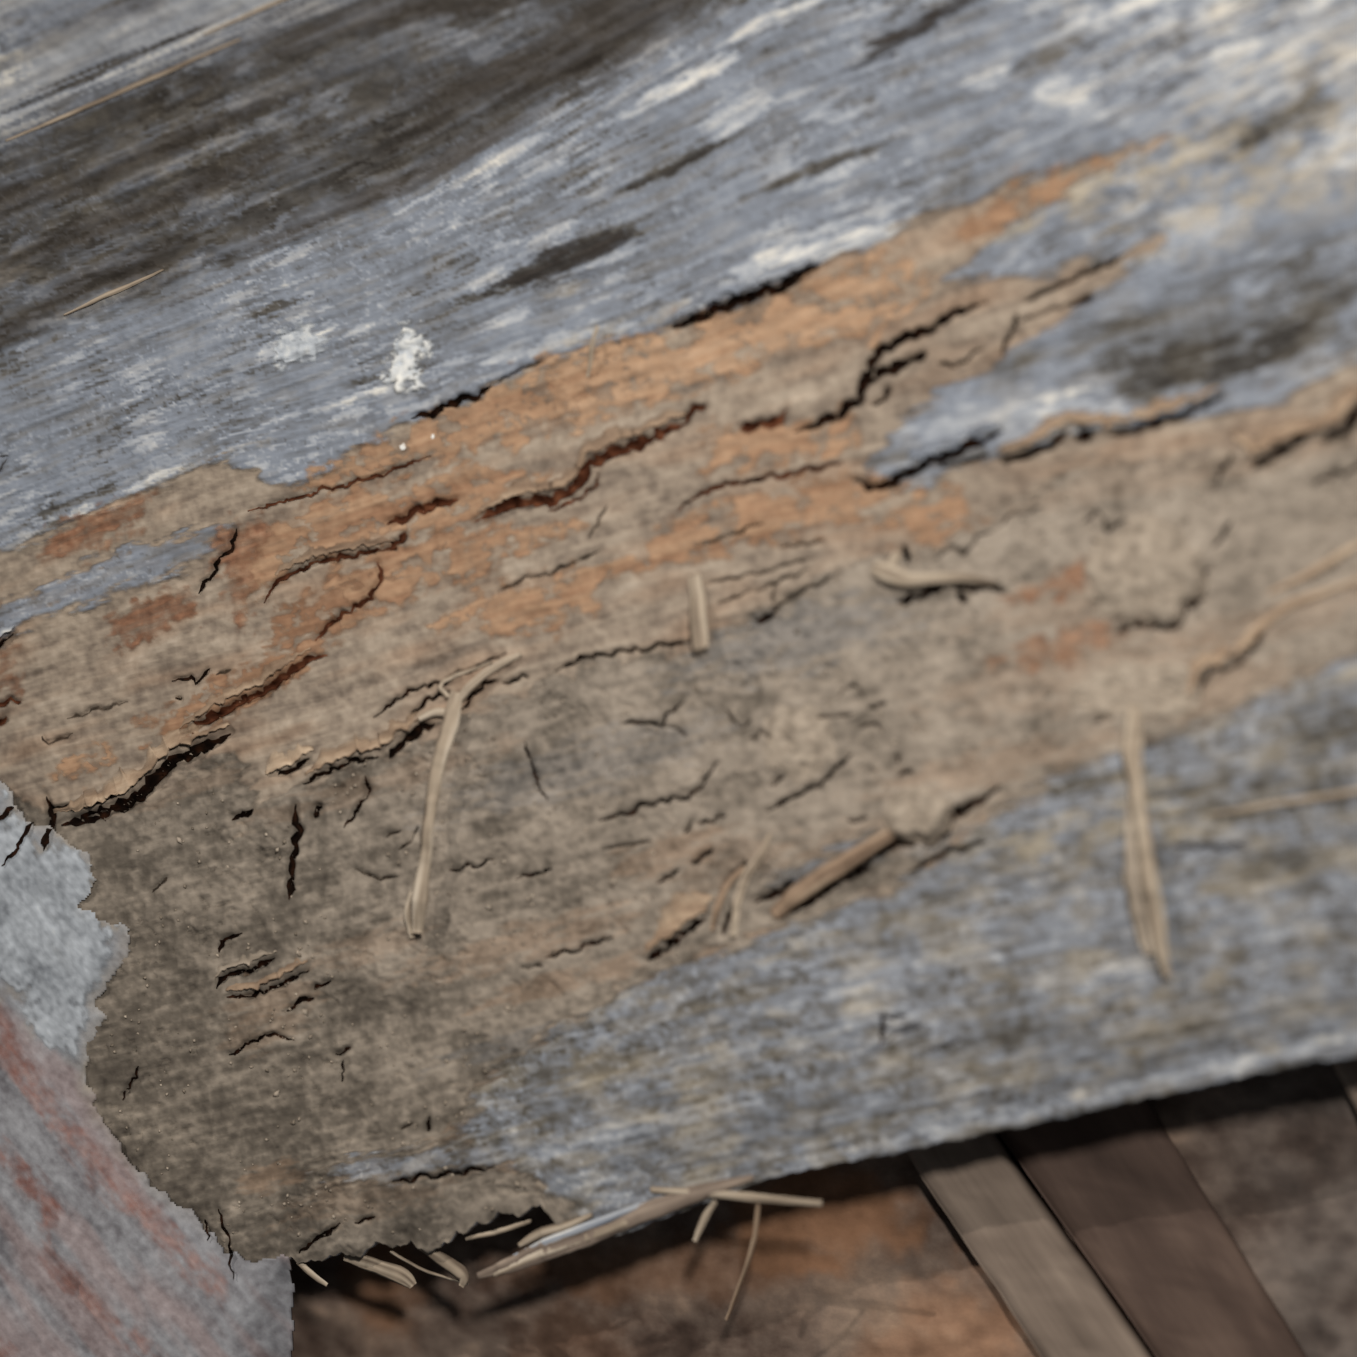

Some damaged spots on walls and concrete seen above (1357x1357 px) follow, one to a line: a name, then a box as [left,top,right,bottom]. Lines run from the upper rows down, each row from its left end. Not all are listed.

water stain [380,321,432,393]
crack [412,360,544,419]
crack [672,264,821,328]
crack [740,255,1125,433]
peeling [0,134,1357,814]
crack [678,394,1225,511]
crack [897,506,1043,606]
crack [0,404,707,900]
peeling [215,950,308,991]
crack [216,933,331,1055]
peeling [644,890,714,951]
crack [647,786,1000,961]